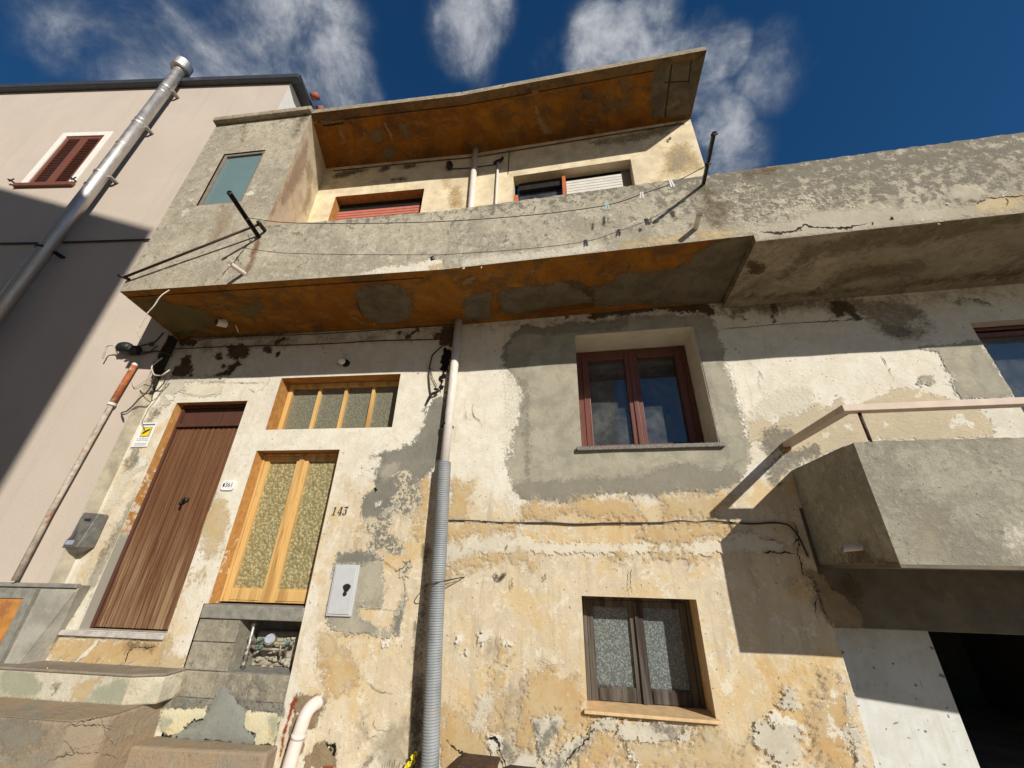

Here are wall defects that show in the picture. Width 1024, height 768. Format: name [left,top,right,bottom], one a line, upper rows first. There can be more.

damp [744,260,767,275]
crack [756,222,874,235]
damp [780,214,1020,279]
damp [586,265,930,337]
peeling [360,439,406,477]
peeling [412,462,438,541]
crack [764,522,832,626]
peeling [440,635,872,768]
crack [563,721,602,768]